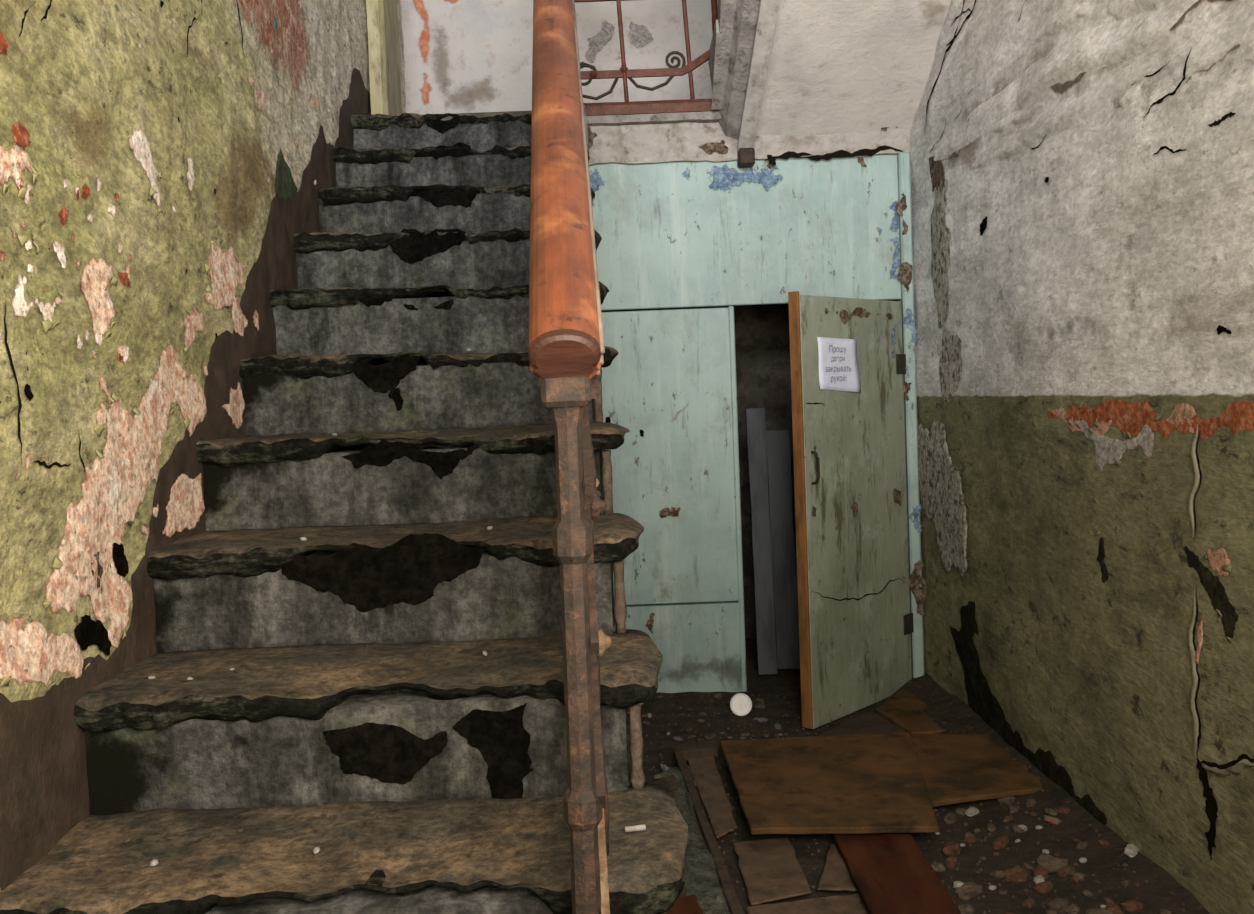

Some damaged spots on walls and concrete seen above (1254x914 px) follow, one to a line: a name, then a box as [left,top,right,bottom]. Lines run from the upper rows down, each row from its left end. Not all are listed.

peeling [237,0,319,112]
peeling [699,140,783,193]
crack [1051,68,1104,94]
crack [1152,146,1187,156]
crack [1131,0,1240,119]
crack [1208,112,1236,127]
peeling [0,239,259,691]
peeling [1047,397,1254,472]
crack [1189,423,1202,539]
flaking render [281,533,487,612]
crack [1188,588,1254,860]